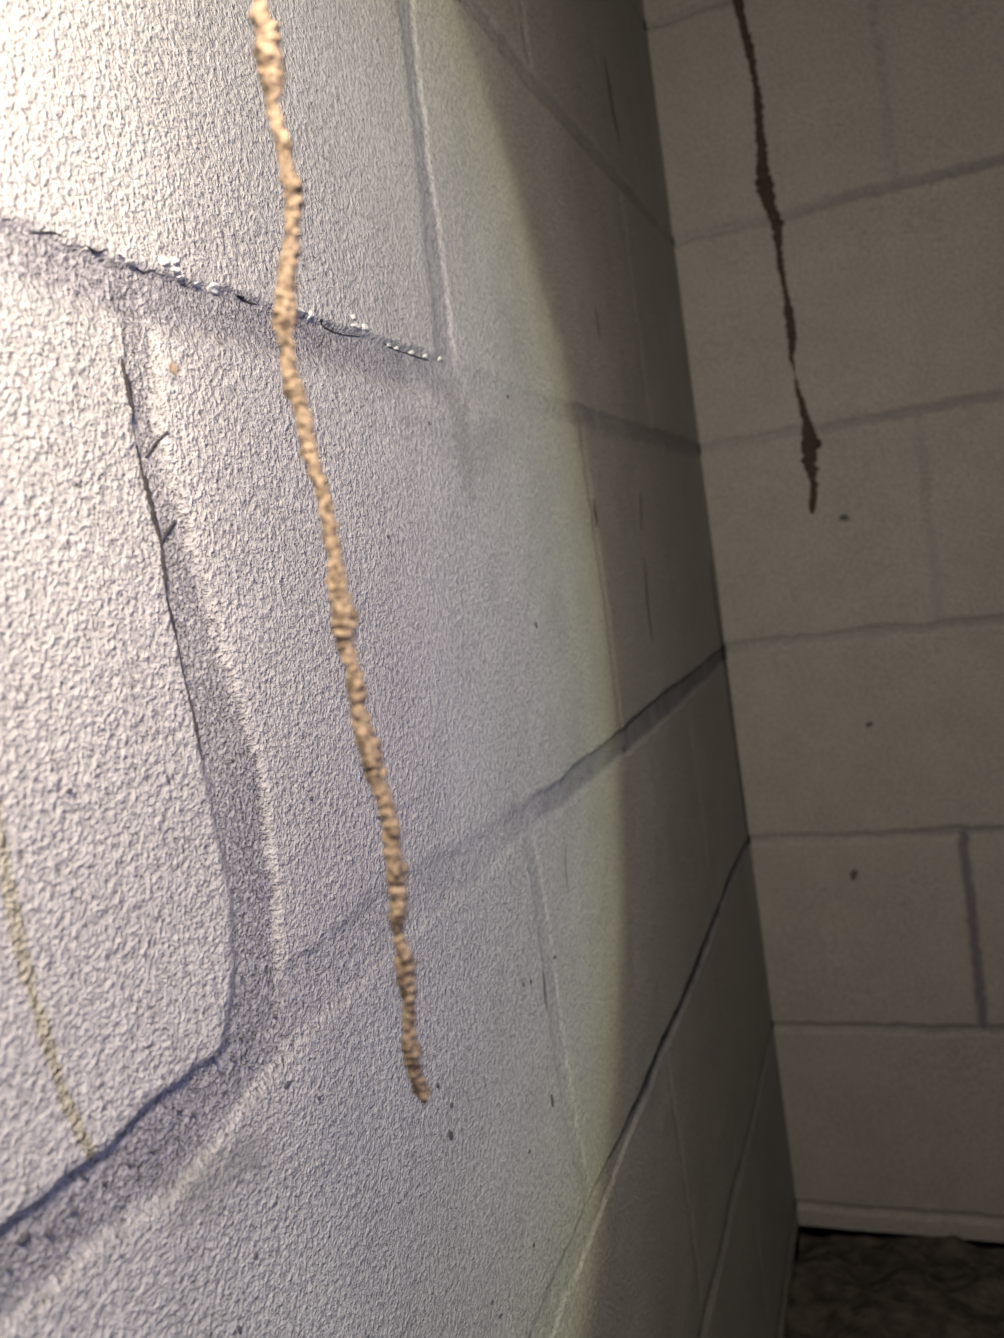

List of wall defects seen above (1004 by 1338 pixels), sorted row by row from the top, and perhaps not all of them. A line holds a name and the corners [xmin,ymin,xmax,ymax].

crack [28,231,108,254]
crack [135,267,189,287]
crack [236,295,257,305]
crack [317,318,429,361]